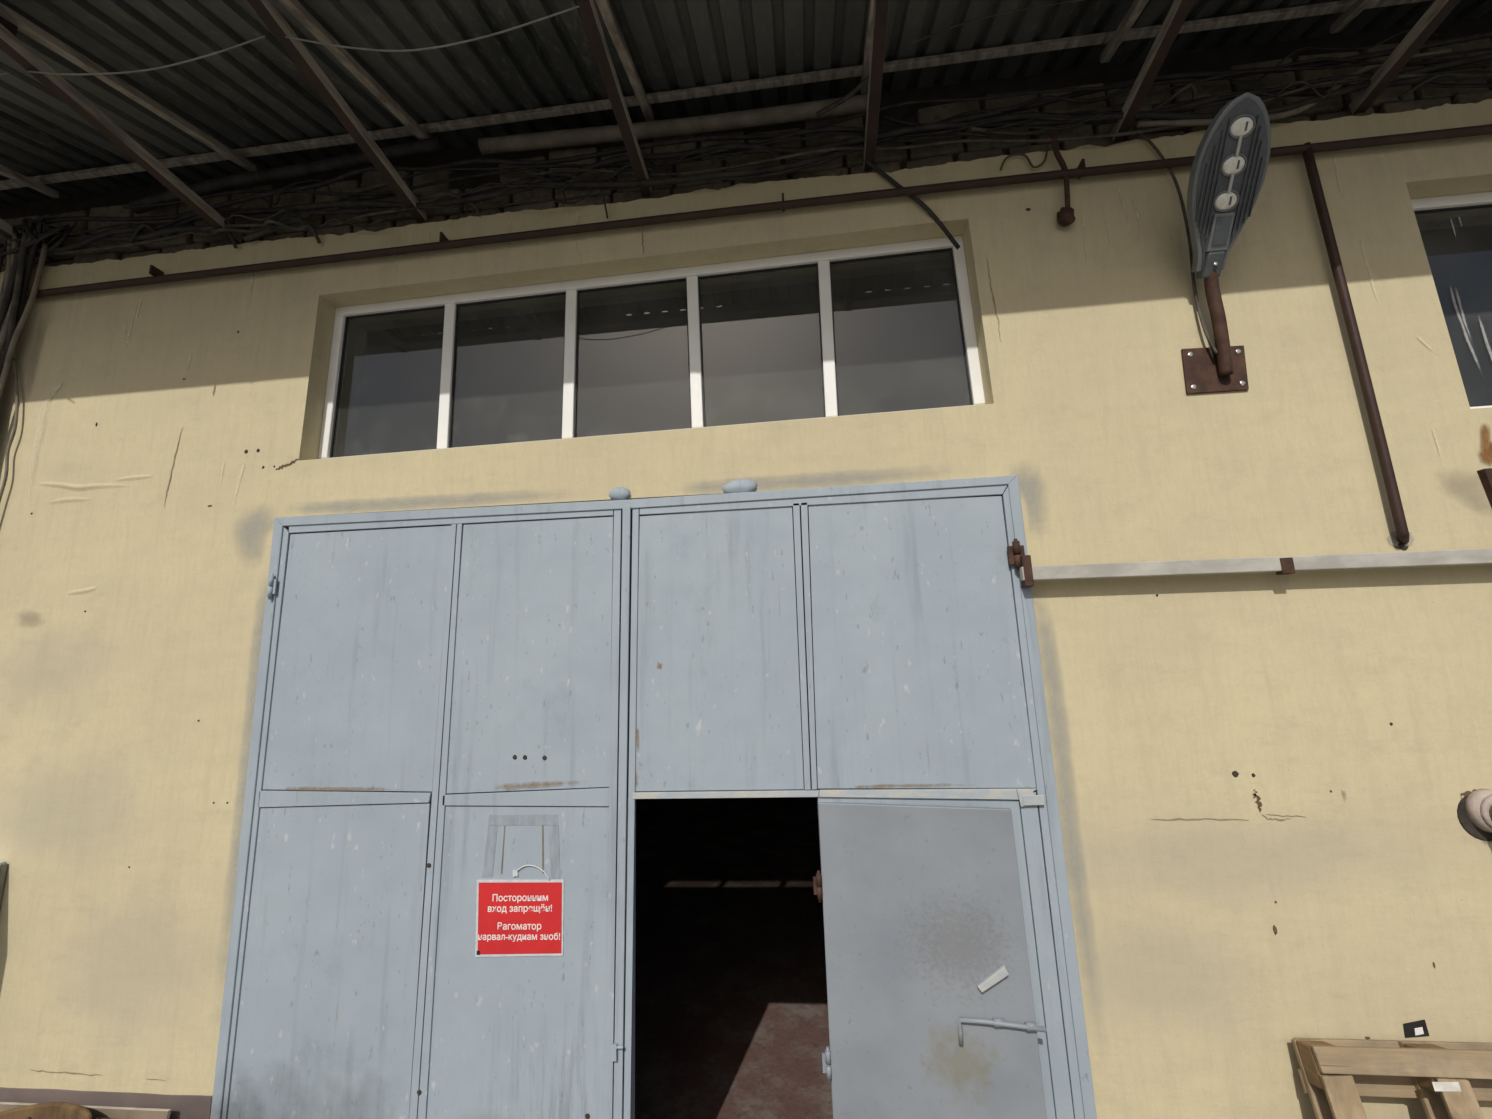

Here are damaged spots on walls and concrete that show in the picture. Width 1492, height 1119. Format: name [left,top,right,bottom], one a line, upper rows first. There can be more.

corrosion [1481,426,1492,463]
crack [164,429,182,505]
crack [1151,789,1304,821]